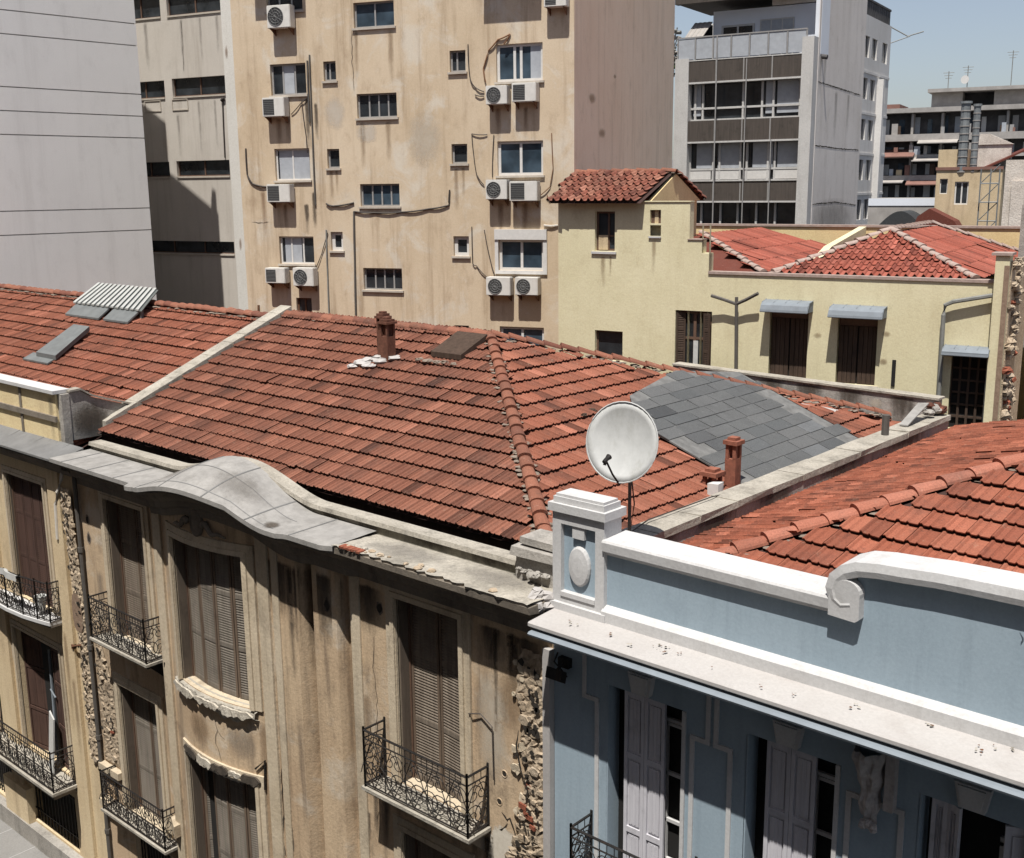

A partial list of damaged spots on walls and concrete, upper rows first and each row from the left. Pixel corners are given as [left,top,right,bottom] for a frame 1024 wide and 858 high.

spalling [992,266,1010,421]
spalling [60,486,99,763]
peeling [501,742,526,778]
flaking render [496,792,536,832]